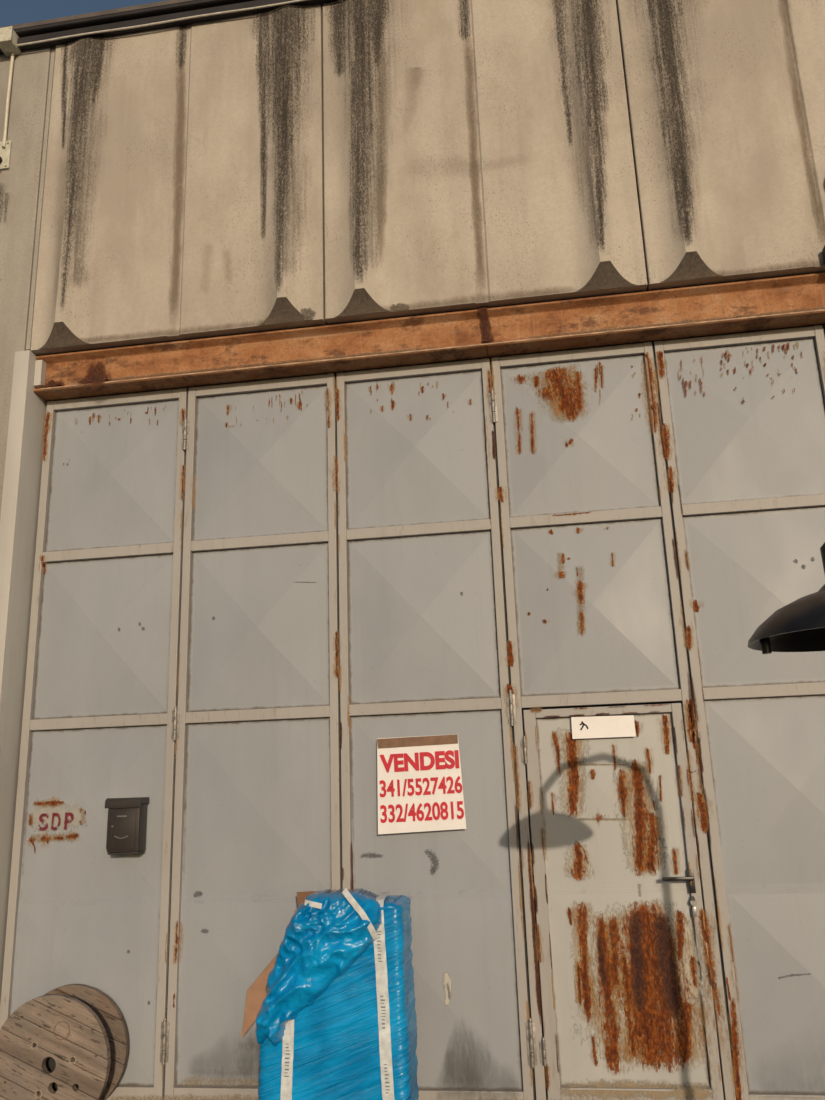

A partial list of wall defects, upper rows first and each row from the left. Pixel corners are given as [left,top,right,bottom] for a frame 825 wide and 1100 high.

damp [61,36,108,303]
damp [257,0,401,326]
damp [554,0,636,291]
damp [649,0,724,282]
damp [39,322,111,349]
corrosion [478,306,493,344]
corrosion [516,407,535,454]
corrosion [516,362,603,421]
corrosion [631,351,683,515]
corrosion [511,728,555,1021]
corrosion [531,626,711,883]
corrosion [552,732,741,1100]